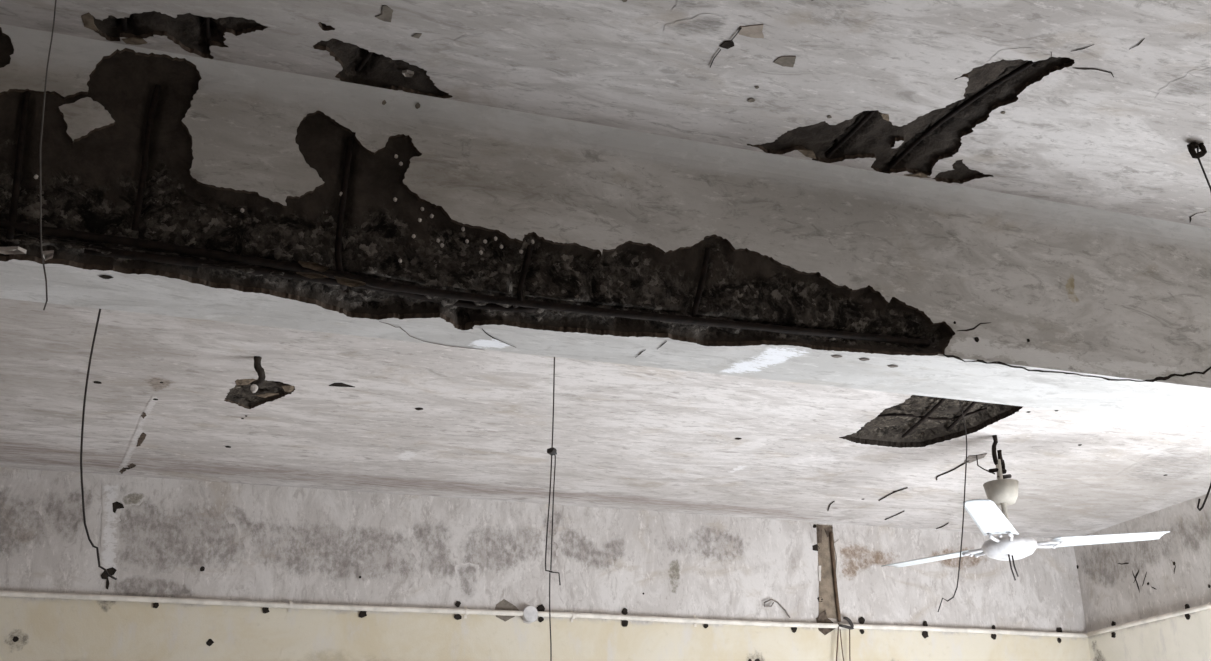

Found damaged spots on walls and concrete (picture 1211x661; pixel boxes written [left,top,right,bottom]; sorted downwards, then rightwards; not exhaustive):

peeling [375,5,393,22]
spalling [747,44,1114,184]
spalling [0,11,955,356]
crack [943,322,1211,382]
spalling [224,378,295,409]
spalling [839,395,1023,448]
damp [0,482,100,566]
damp [94,486,629,614]
damp [649,520,752,595]